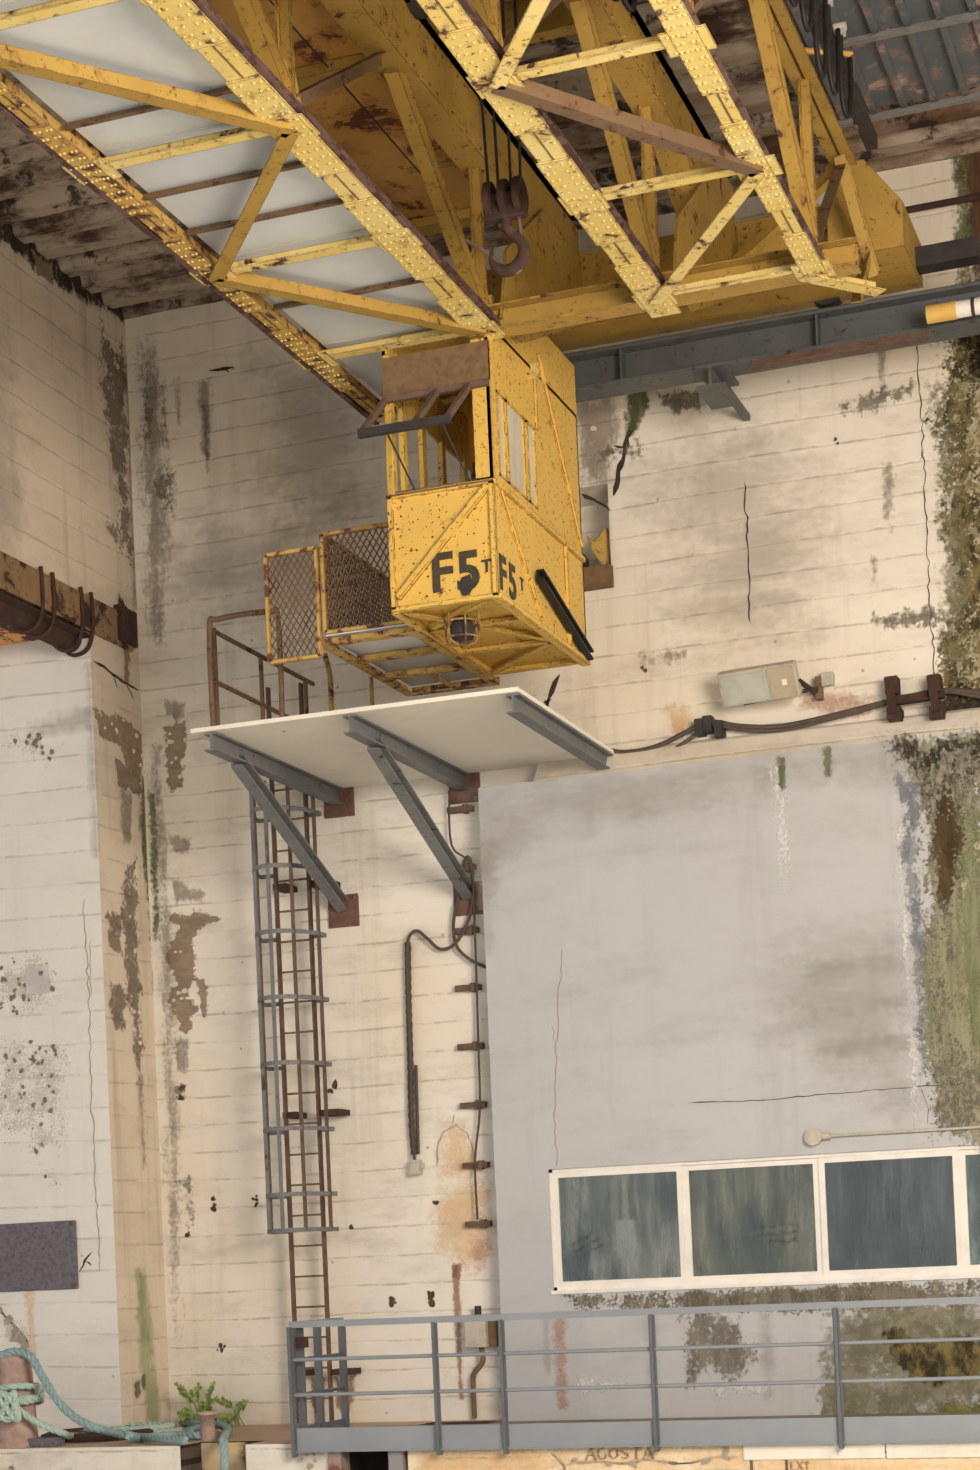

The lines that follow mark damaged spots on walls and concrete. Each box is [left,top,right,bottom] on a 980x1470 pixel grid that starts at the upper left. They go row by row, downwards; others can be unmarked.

damp [0,223,124,324]
damp [154,468,174,510]
crack [743,482,751,623]
peeling [93,707,143,796]
peeling [105,858,144,1084]
peeling [166,909,221,1034]
damp [896,762,970,1126]
spalling [4,1040,57,1154]
corrosion [447,1130,472,1171]
crack [551,952,562,1167]
corrosion [441,1189,486,1399]
damp [680,1313,757,1389]